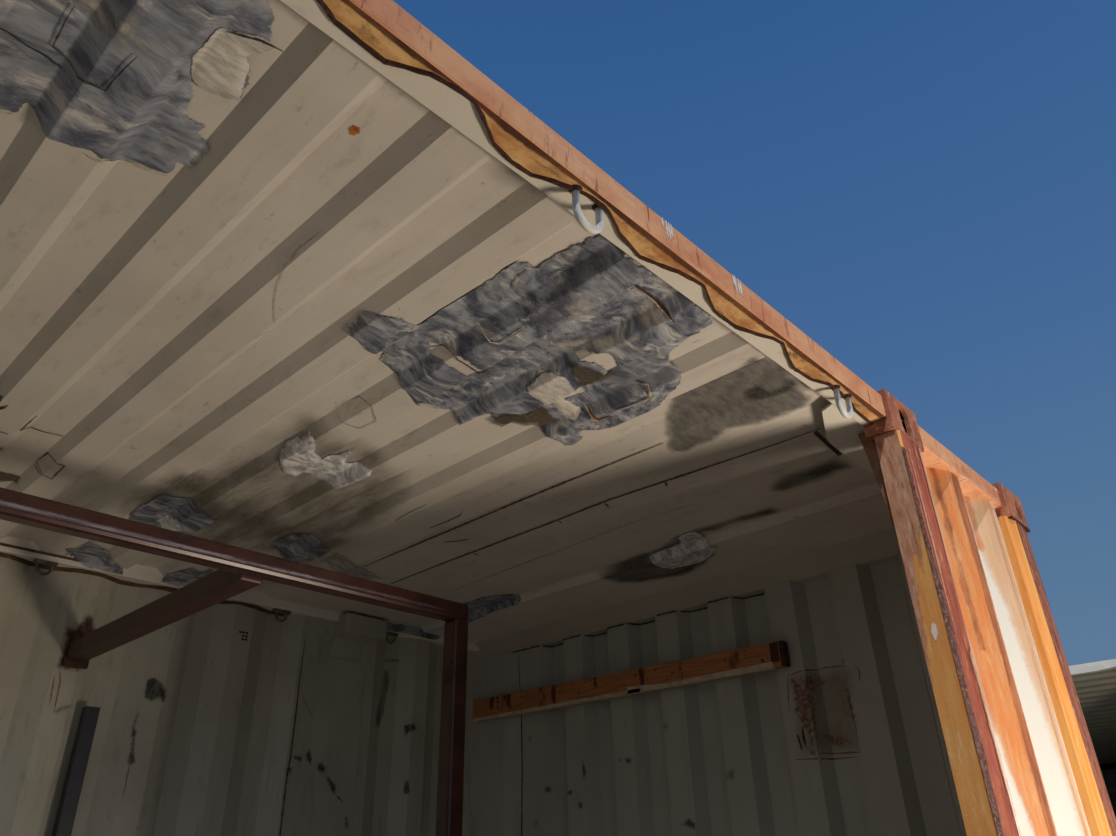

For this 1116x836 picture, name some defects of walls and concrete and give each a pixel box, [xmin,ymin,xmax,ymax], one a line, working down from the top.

peeling [191,28,276,100]
rust [323,0,886,422]
peeling [527,372,651,422]
peeling [156,515,183,531]
water stain [606,543,704,582]
rust [926,467,1089,836]